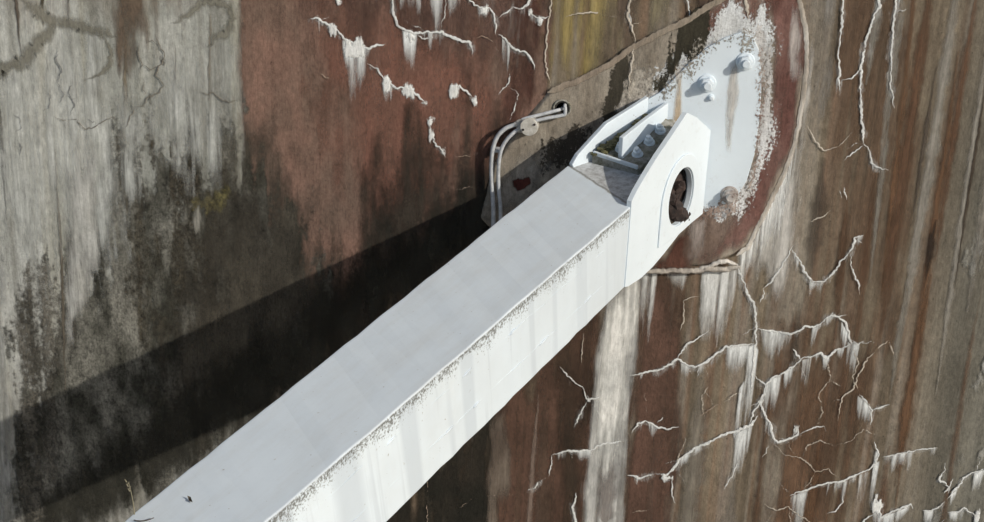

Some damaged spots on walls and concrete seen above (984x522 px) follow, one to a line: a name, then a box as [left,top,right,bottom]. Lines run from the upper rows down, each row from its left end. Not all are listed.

leakage [0,0,510,522]
corrosion [239,0,553,300]
crack [310,0,598,157]
leakage [558,273,657,522]
corrosion [621,0,805,522]
crack [528,235,984,522]
crack [807,0,906,170]